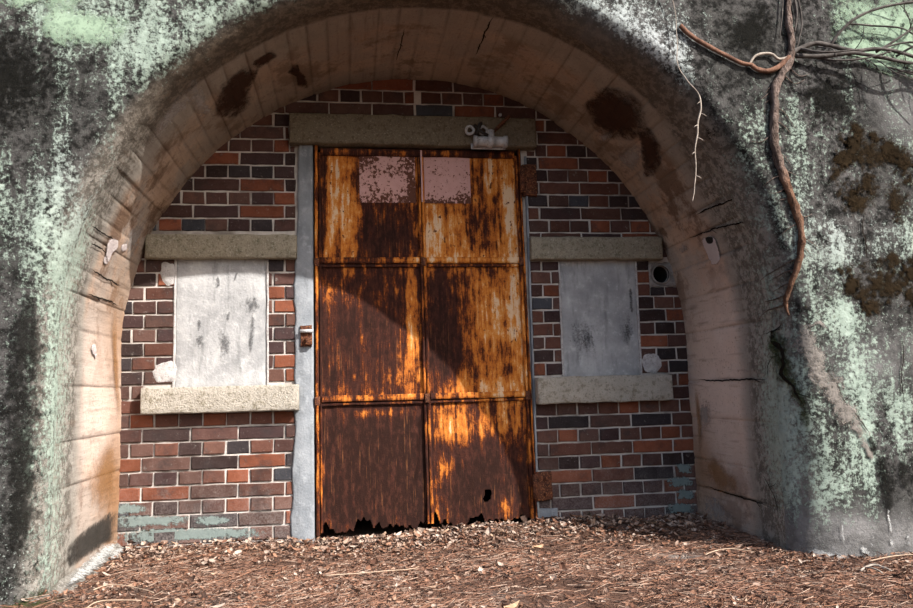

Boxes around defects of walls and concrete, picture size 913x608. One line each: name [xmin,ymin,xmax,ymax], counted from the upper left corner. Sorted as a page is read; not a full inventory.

water stain [154,52,276,136]
water stain [586,88,661,177]
crack [690,199,743,238]
crack [89,227,118,306]
crack [700,322,809,409]
water stain [0,295,51,553]
water stain [869,436,911,531]
water stain [68,512,123,582]